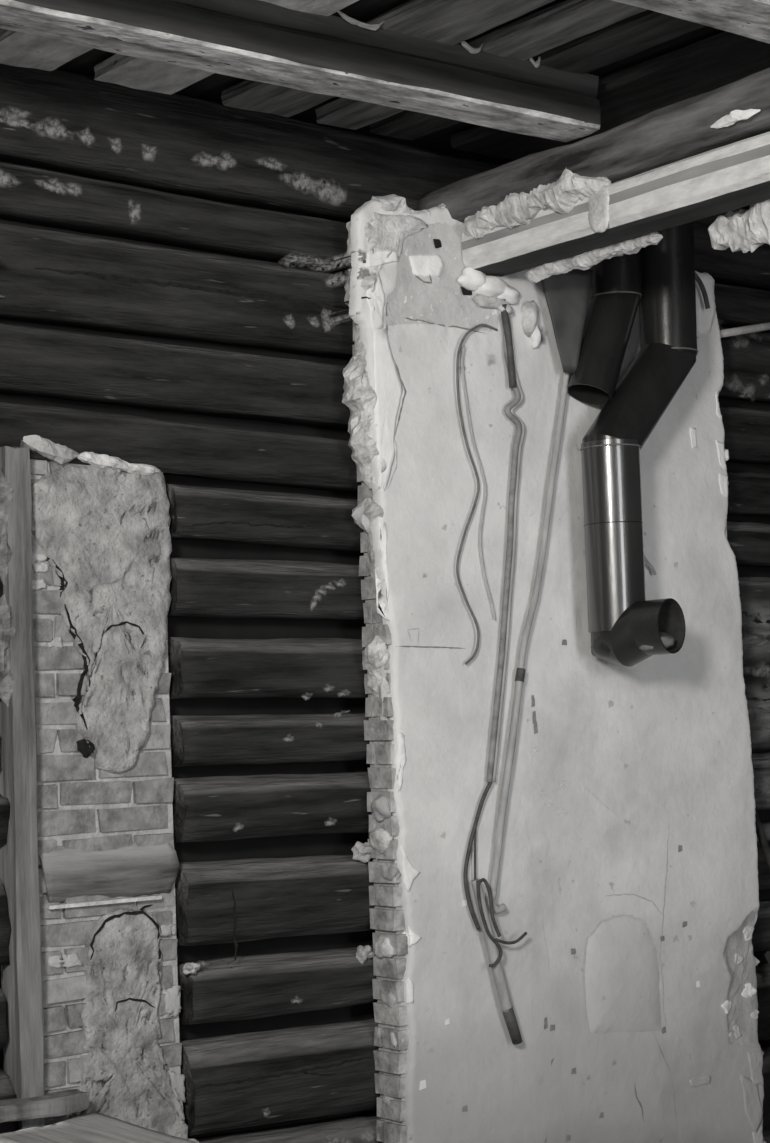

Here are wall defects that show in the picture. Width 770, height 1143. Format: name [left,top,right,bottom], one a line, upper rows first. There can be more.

peeling [342,194,502,620]
spalling [23,435,160,475]
spalling [32,551,90,730]
crack [104,621,145,648]
spalling [363,636,391,720]
spalling [369,731,421,892]
spalling [48,954,84,968]
crack [90,904,161,1012]
spalling [161,985,181,1019]
spalling [374,935,394,959]
spalling [721,908,766,1143]
spalling [168,1070,186,1103]